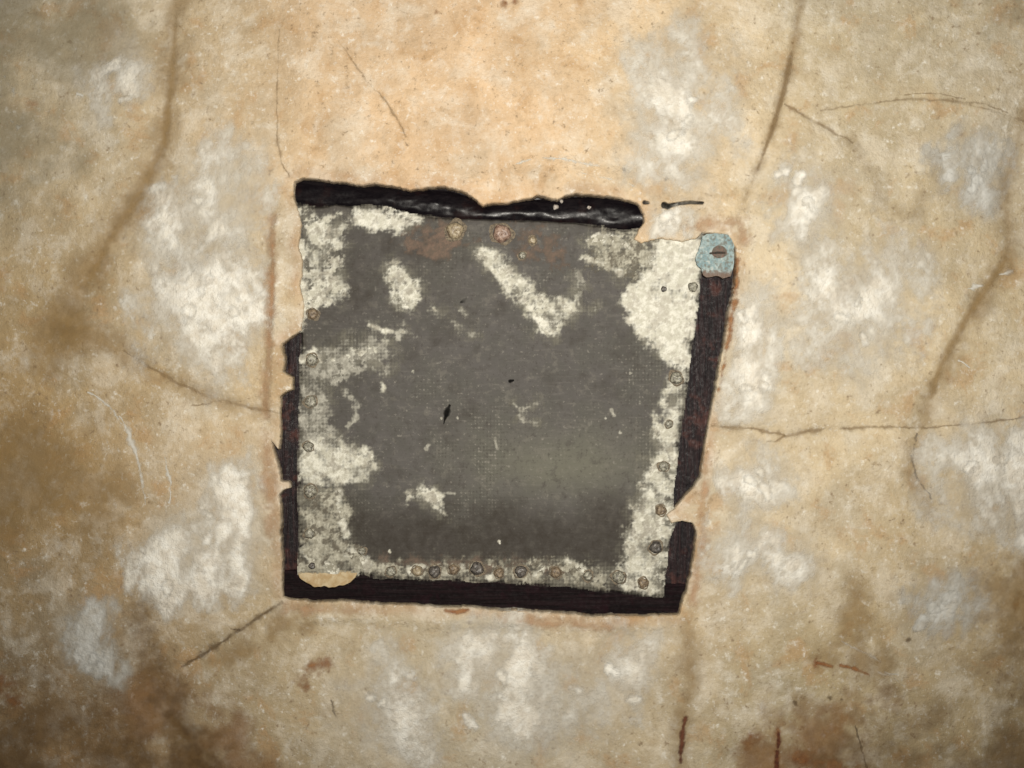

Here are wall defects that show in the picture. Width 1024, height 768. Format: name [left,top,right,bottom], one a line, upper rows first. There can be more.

damp [143,128,273,381]
peeling [298,204,424,332]
damp [651,206,693,239]
damp [719,163,933,425]
peeling [297,227,701,596]
damp [121,463,263,621]
damp [701,456,812,595]
damp [920,422,1024,549]
damp [66,599,130,684]
crack [189,608,273,662]
damp [366,640,437,768]
damp [444,607,576,747]